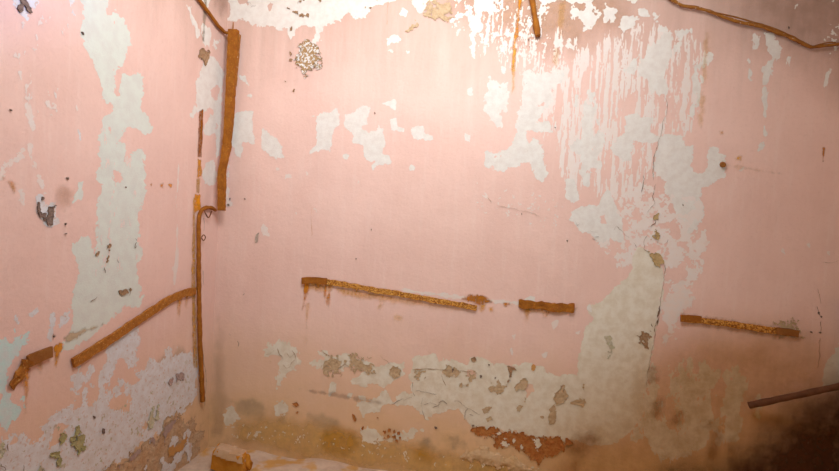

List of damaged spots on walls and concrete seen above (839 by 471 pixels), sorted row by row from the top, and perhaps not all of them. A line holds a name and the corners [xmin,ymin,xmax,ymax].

peeling [227,0,396,79]
corrosion [512,0,522,72]
peeling [186,5,234,207]
peeling [47,0,153,352]
corrosion [71,109,203,368]
peeling [263,0,726,471]
corrosion [301,277,491,311]
corrosion [519,299,575,313]
corrosion [680,315,800,337]
peeling [0,315,205,471]
damp [241,422,509,471]
damp [732,396,839,471]